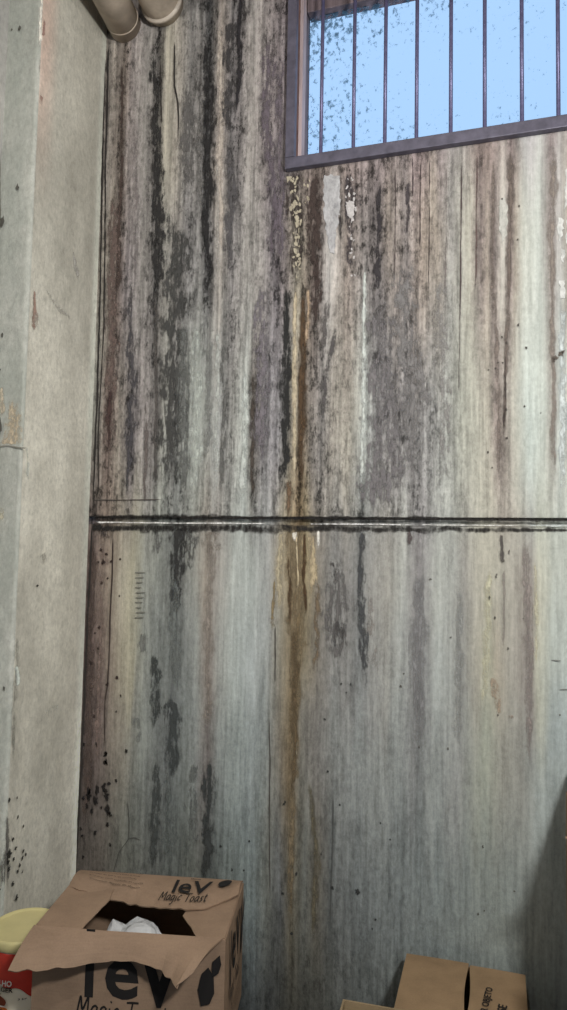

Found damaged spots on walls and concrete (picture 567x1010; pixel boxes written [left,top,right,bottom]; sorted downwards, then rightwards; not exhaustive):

damp [103,61,227,498]
damp [178,0,243,291]
damp [238,290,293,492]
damp [260,44,336,422]
corrosion [286,290,310,513]
peeling [287,176,310,278]
peeling [323,174,357,259]
damp [356,159,460,505]
damp [494,157,514,463]
peeling [557,169,567,263]
corrosion [271,531,321,927]
damp [80,514,567,875]